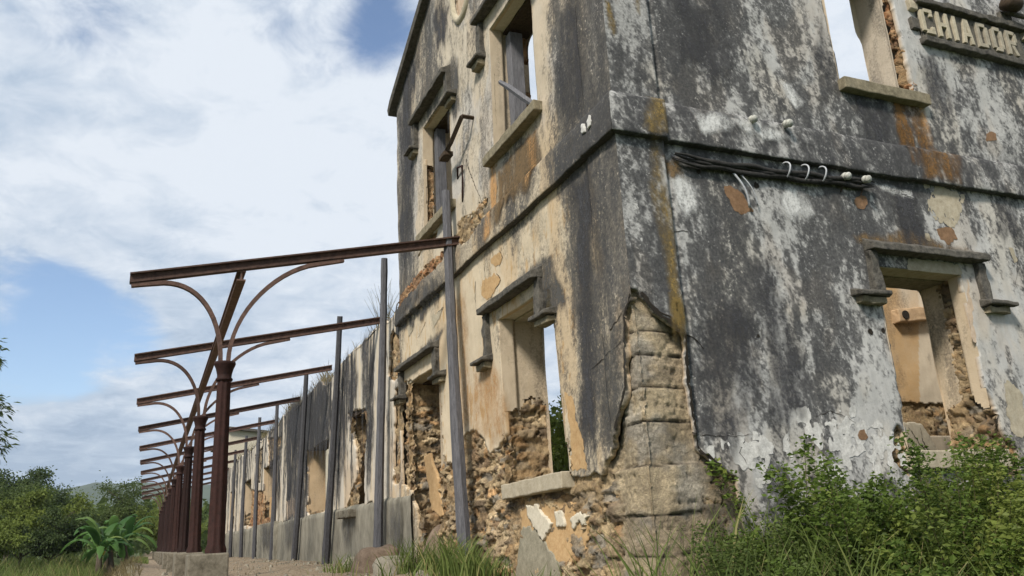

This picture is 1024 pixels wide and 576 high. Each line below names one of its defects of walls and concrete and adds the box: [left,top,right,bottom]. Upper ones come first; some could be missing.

water stain [814,45,832,78]
flaking render [882,0,917,90]
flaking render [398,198,487,307]
peeling [481,252,503,300]
water stain [575,178,620,439]
flaking render [724,185,753,214]
peeling [924,184,965,245]
water stain [269,336,373,547]
flaking render [349,408,369,506]
flaking render [389,281,1024,576]